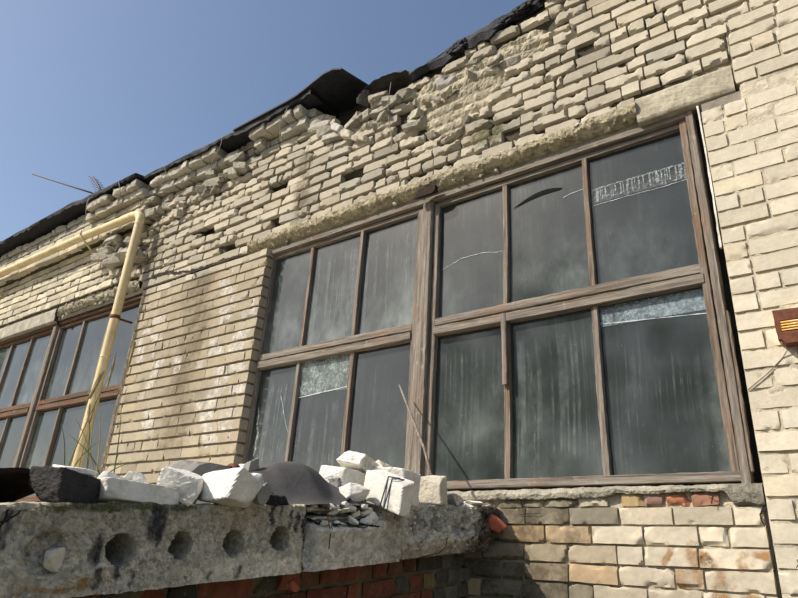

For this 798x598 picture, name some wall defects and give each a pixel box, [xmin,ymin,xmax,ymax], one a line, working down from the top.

spalling [401,29,554,146]
spalling [247,102,638,254]
damp [219,279,255,325]
damp [137,316,165,363]
damp [197,329,250,369]
damp [142,411,155,434]
damp [197,362,245,447]
spalling [401,507,476,558]
corrosion [687,548,727,598]